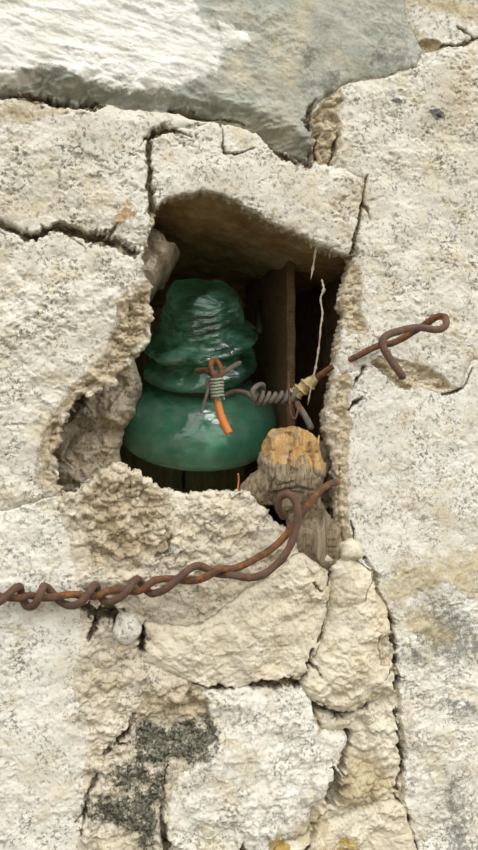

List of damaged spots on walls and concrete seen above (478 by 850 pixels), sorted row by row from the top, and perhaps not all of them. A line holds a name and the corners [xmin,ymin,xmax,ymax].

crack [0,223,138,259]
crack [349,175,370,257]
spalling [340,265,368,335]
spalling [35,279,153,494]
spalling [325,356,472,541]
spalling [75,464,169,570]
crack [81,602,119,642]
crack [137,625,146,651]
crack [191,571,332,690]
crack [102,720,132,756]
crack [385,614,418,850]
crack [160,821,172,850]